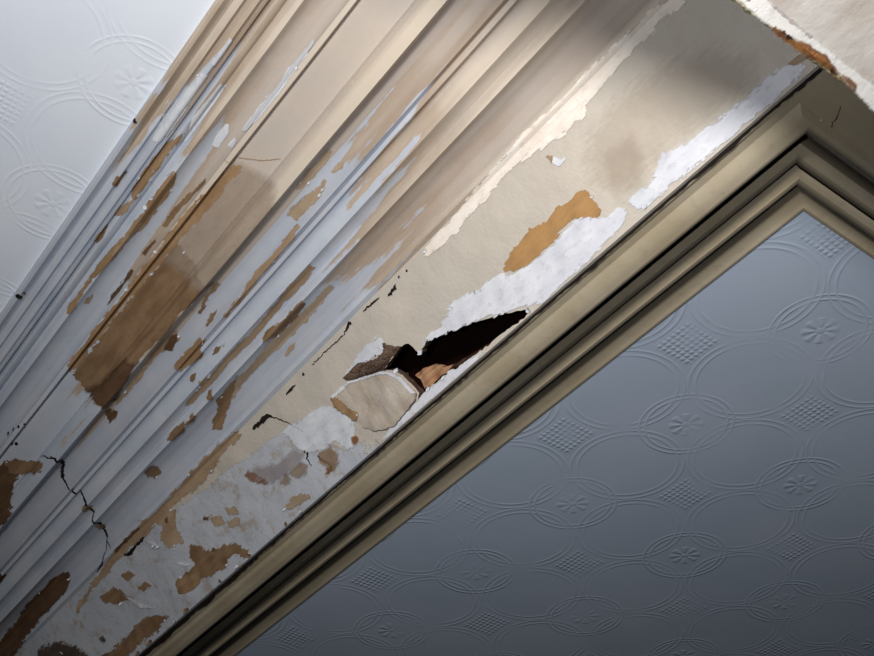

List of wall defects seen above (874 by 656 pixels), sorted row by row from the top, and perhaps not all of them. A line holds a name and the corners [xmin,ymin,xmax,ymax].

peeling [0,458,43,528]
peeling [0,572,70,656]
crack [40,455,110,572]
peeling [67,38,232,314]
peeling [67,150,344,656]
peeling [212,39,314,148]
crack [135,68,823,656]
peeling [282,0,874,453]